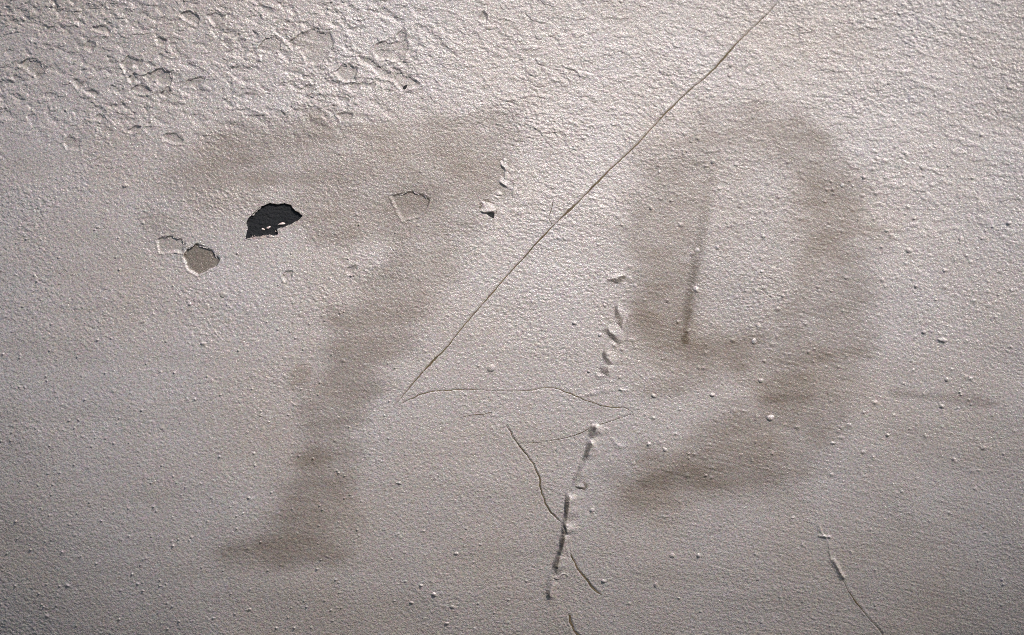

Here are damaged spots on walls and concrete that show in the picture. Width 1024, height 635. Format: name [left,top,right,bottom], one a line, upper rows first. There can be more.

spalling [246,203,302,239]
peeling [158,234,220,274]
crack [401,1,779,521]
crack [570,554,602,595]